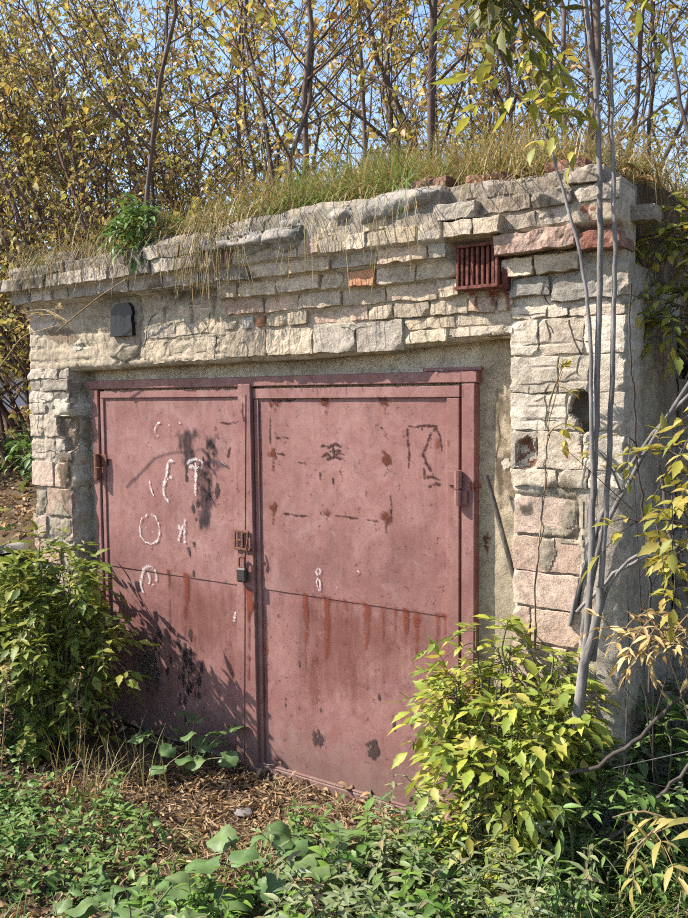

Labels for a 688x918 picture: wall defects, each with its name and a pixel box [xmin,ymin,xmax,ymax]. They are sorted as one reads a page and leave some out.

spalling [569,386,594,444]
peeling [185,465,219,521]
spalling [501,438,538,515]
spalling [538,492,584,572]
rust [322,596,330,657]
rust [394,607,419,653]
peeling [153,627,205,708]
peeling [312,729,325,747]
peeling [364,739,379,760]